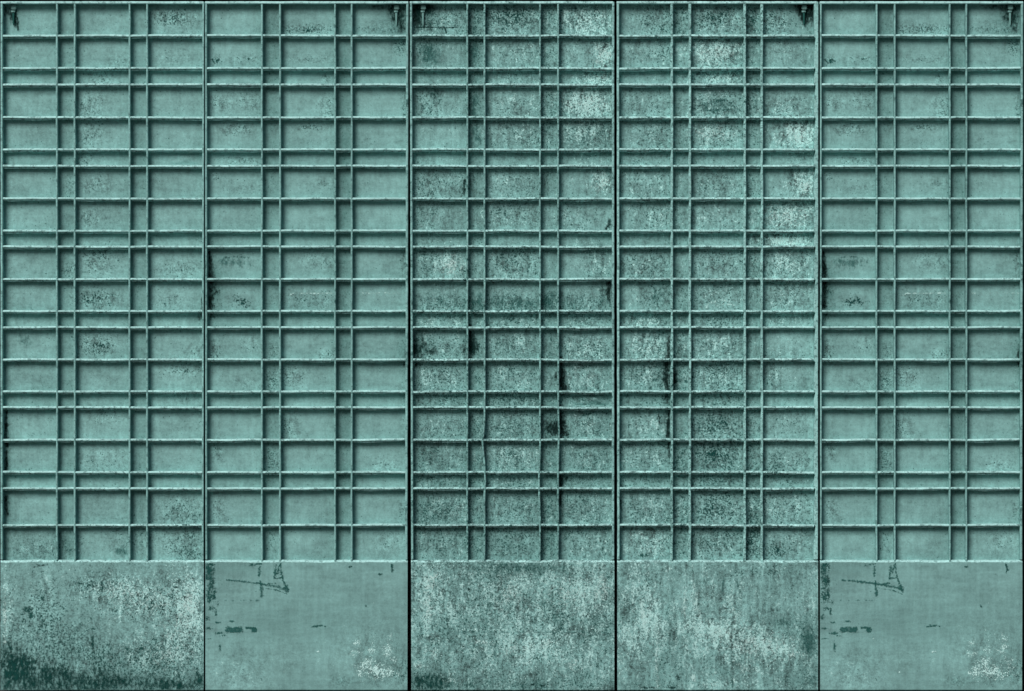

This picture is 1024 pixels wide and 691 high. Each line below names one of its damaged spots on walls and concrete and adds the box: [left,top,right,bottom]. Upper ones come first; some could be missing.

peeling [75,563,257,668]
peeling [821,563,872,649]
damp [1,636,203,689]